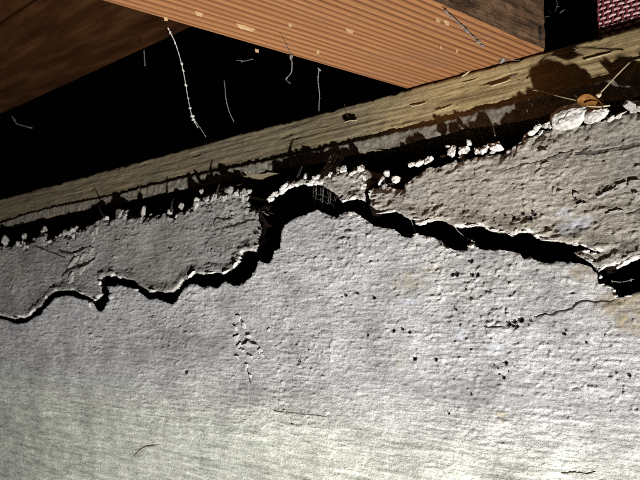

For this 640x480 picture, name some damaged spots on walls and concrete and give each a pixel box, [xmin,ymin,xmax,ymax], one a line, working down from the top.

spalling [522,100,640,142]
spalling [408,140,513,174]
spalling [502,142,640,172]
spalling [0,165,401,284]
crack [0,168,640,324]